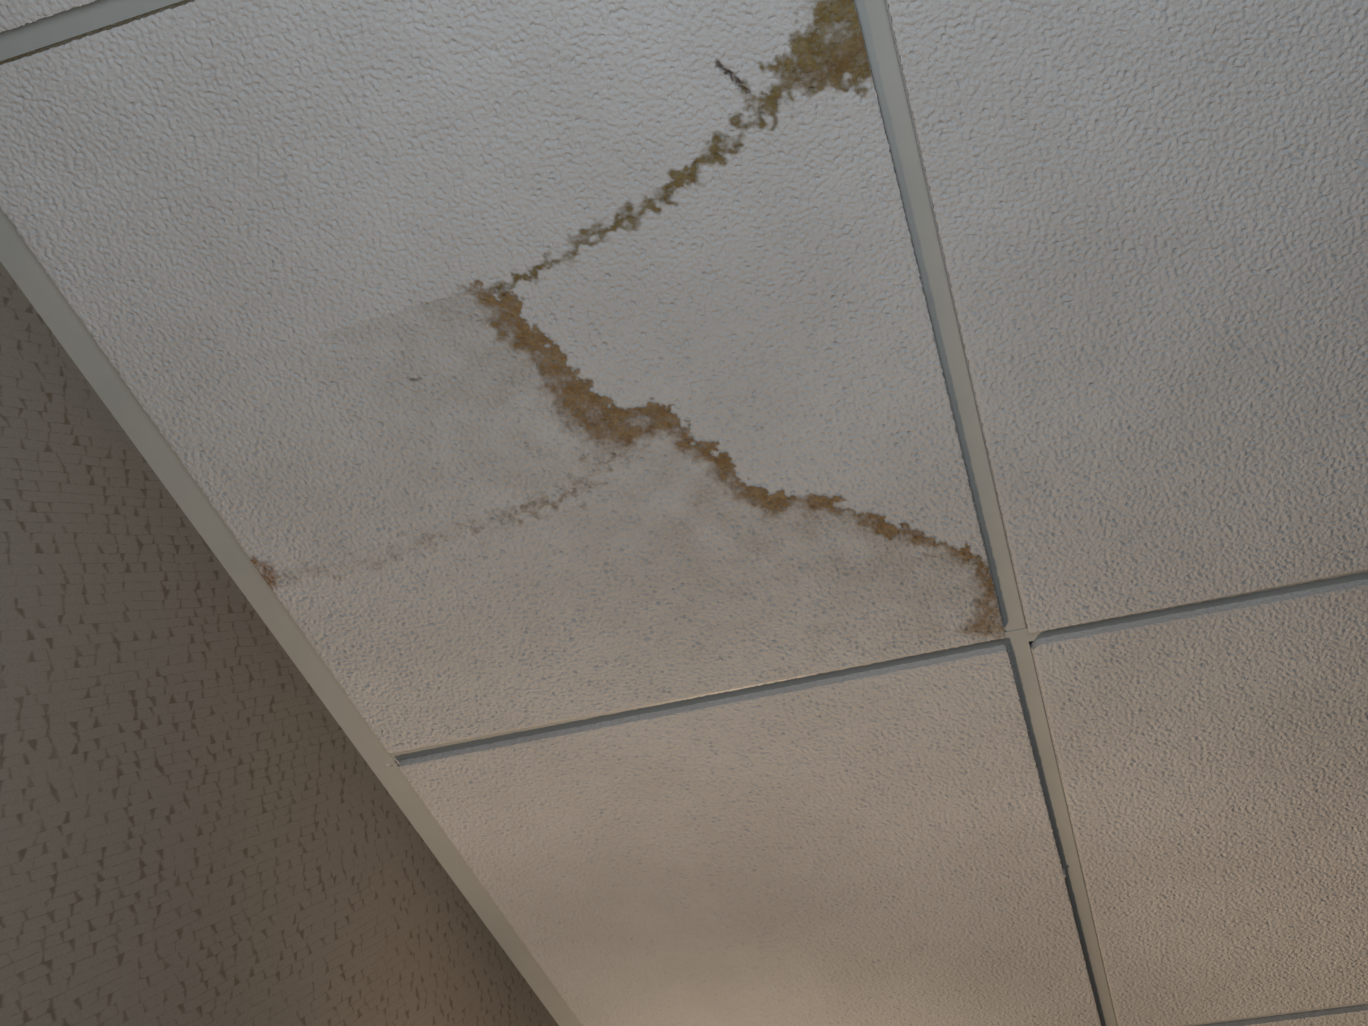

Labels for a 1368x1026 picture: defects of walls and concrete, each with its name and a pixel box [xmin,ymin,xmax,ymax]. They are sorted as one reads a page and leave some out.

damp [471,0,1004,635]